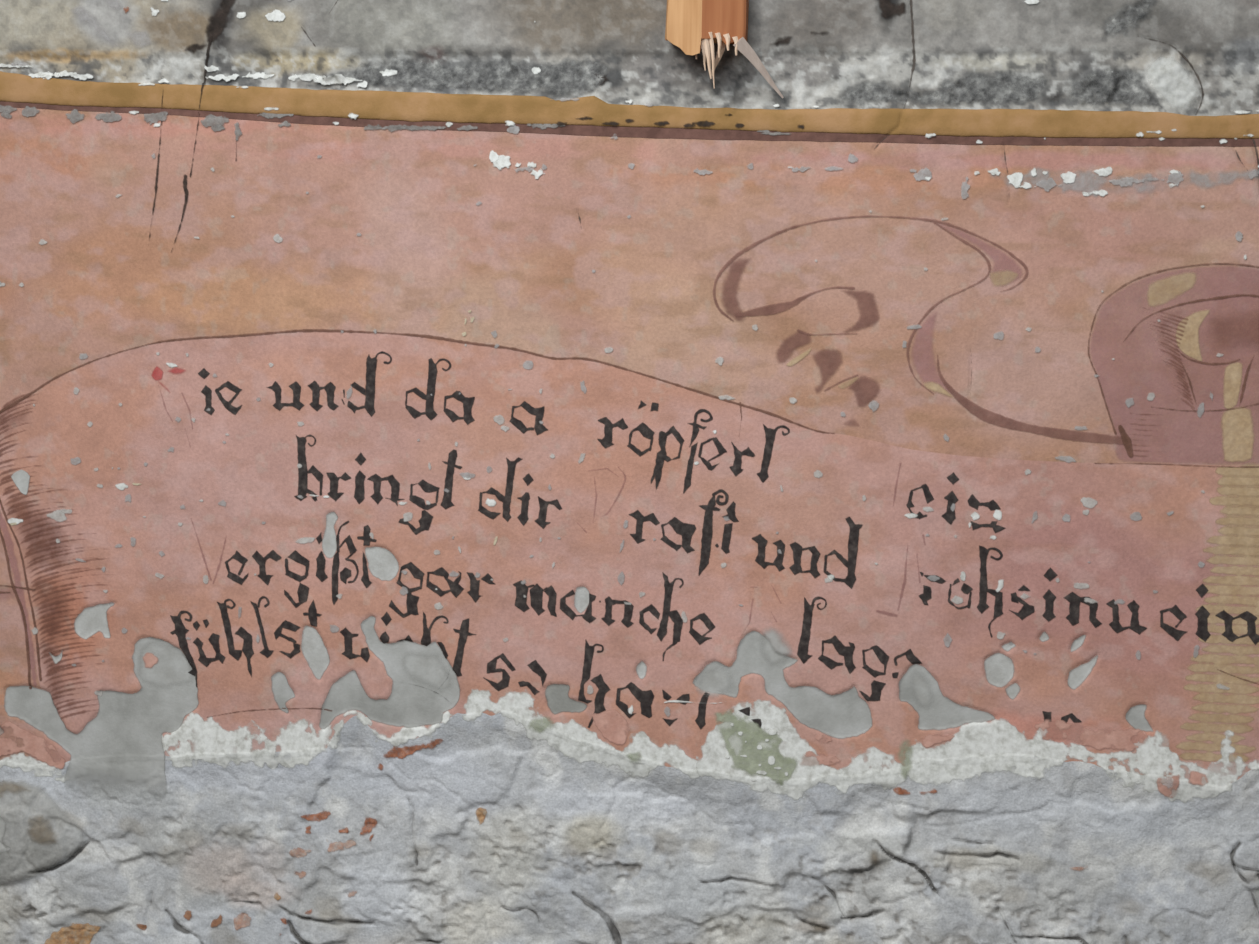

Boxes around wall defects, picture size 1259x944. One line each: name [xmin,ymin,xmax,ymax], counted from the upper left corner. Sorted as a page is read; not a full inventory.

peeling [0,105,39,118]
peeling [66,109,168,127]
peeling [201,114,242,140]
peeling [489,150,547,179]
peeling [961,166,1259,199]
flaking render [0,587,1259,944]
crack [41,843,88,873]
crack [880,846,935,891]
crack [976,842,1010,857]
crack [165,910,191,933]
crack [287,913,363,944]
crack [572,892,621,944]